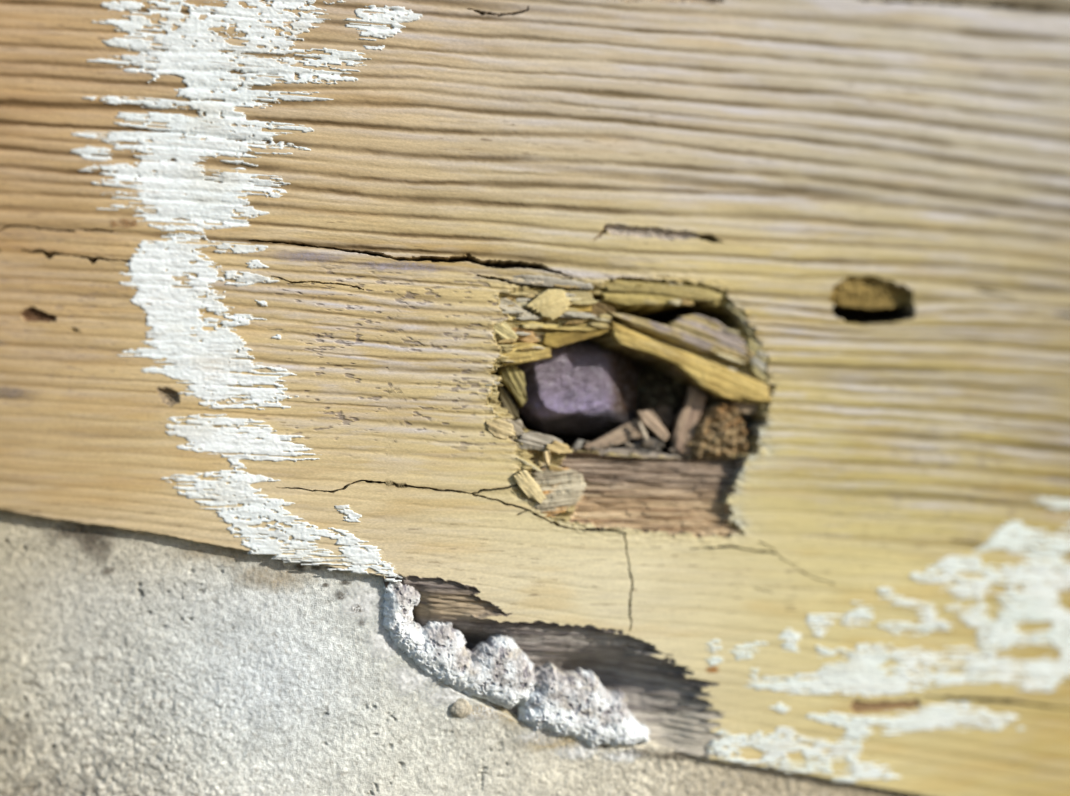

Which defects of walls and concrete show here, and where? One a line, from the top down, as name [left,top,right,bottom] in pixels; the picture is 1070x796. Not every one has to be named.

crack [0,224,132,264]
peeling [70,0,423,582]
spalling [485,274,777,539]
crack [275,480,633,633]
crack [690,541,837,586]
water stain [323,580,399,658]
peeling [705,497,1070,783]
water stain [393,668,517,720]
water stain [522,730,639,762]